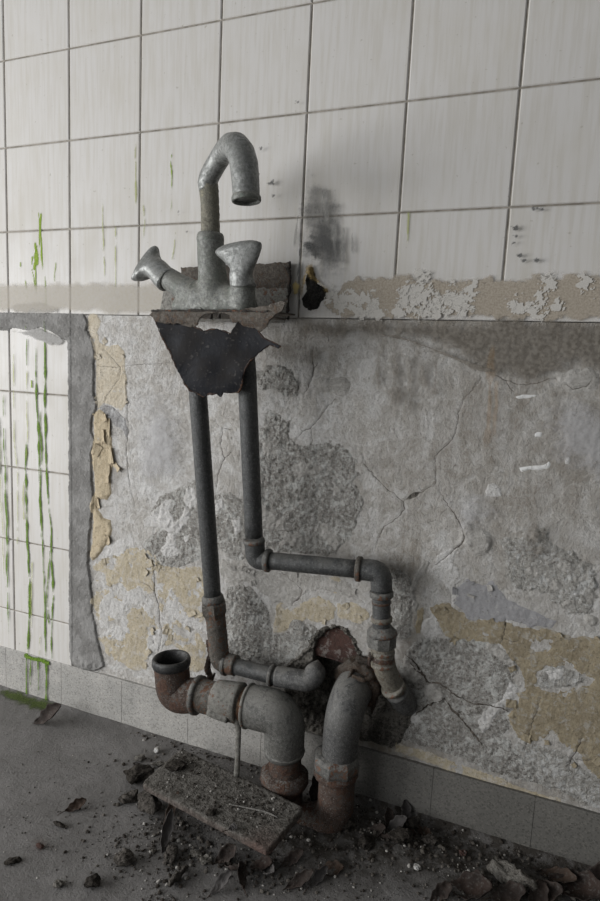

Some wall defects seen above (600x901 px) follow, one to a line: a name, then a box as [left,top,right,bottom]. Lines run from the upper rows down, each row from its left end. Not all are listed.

water stain [294,188,354,306]
spalling [256,364,300,397]
water stain [308,269,600,378]
spalling [87,314,206,672]
spalling [259,409,364,557]
crack [362,387,474,566]
spalling [485,483,502,497]
spalling [519,462,551,472]
spalling [214,492,369,735]
spalling [499,527,600,615]
crack [405,654,508,745]
spalling [359,548,600,809]